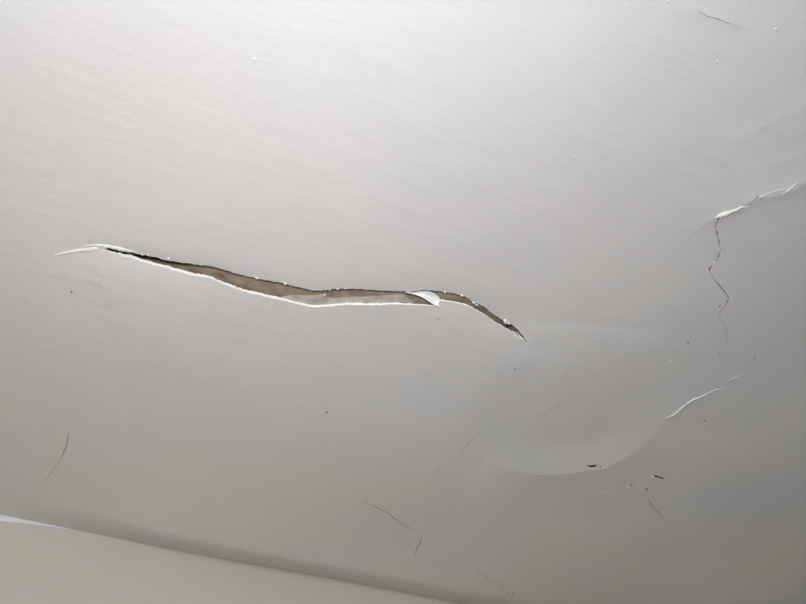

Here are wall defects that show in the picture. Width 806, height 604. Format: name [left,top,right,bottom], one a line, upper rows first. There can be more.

crack [55,244,528,344]
crack [685,181,805,330]